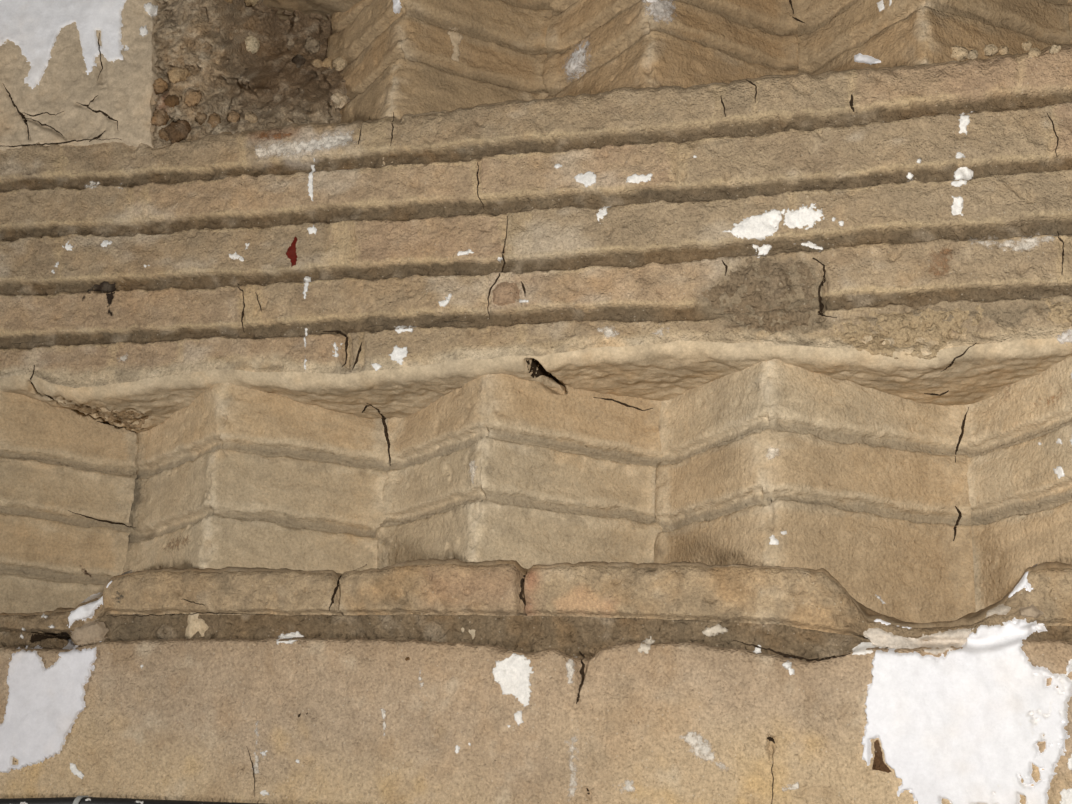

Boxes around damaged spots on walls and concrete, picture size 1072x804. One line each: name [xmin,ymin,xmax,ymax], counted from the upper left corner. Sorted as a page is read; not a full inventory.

crack [0,33,121,147]
peeling [0,0,129,89]
spalling [139,0,351,148]
crack [476,162,526,319]
crack [362,403,391,466]
peeling [0,569,134,773]
crack [576,651,585,704]
peeling [852,564,1072,804]
peeling [70,763,84,779]